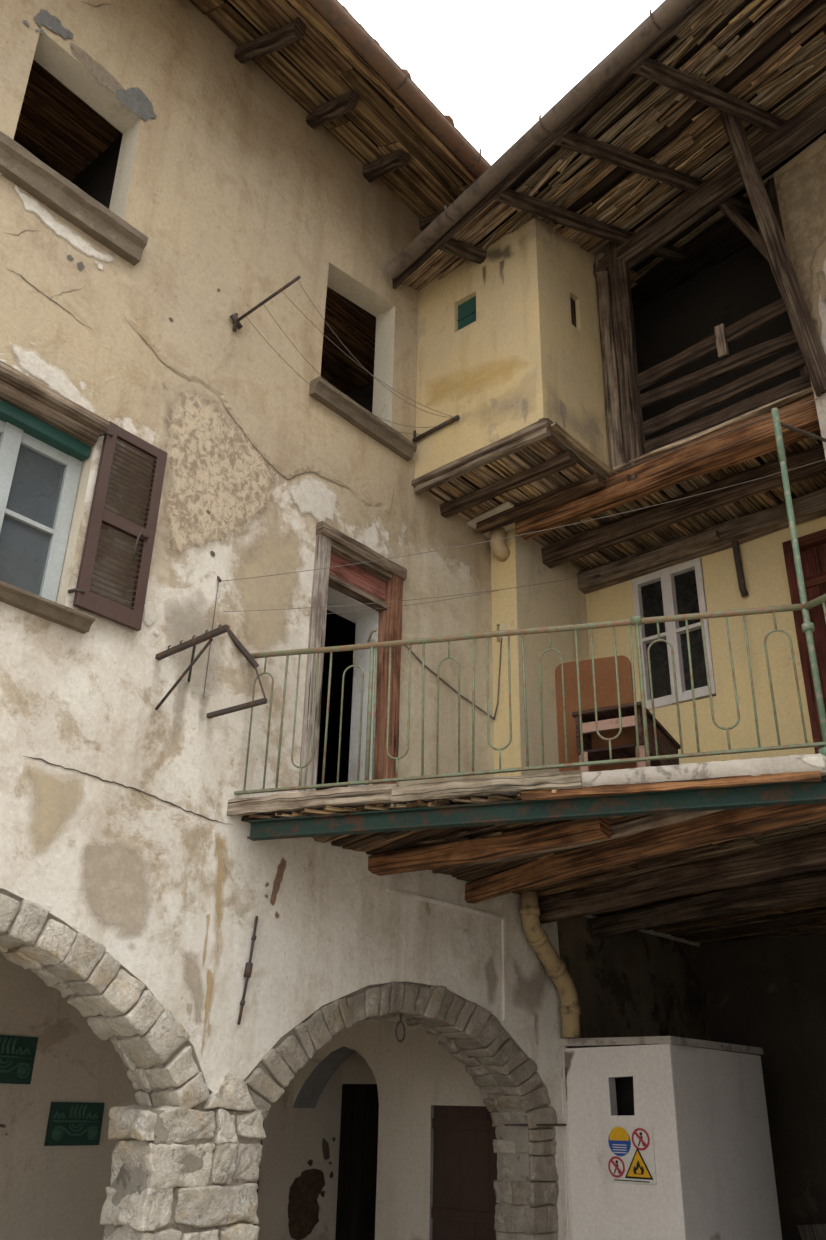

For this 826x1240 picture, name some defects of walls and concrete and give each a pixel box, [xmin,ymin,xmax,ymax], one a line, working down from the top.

flaking render [14,185,113,269]
crack [6,268,93,330]
flaking render [10,343,96,413]
flaking render [164,383,275,556]
crack [222,402,345,487]
flaking render [289,477,337,522]
flaking render [235,532,302,650]
crack [25,756,225,824]
spalling [288,1138,336,1240]